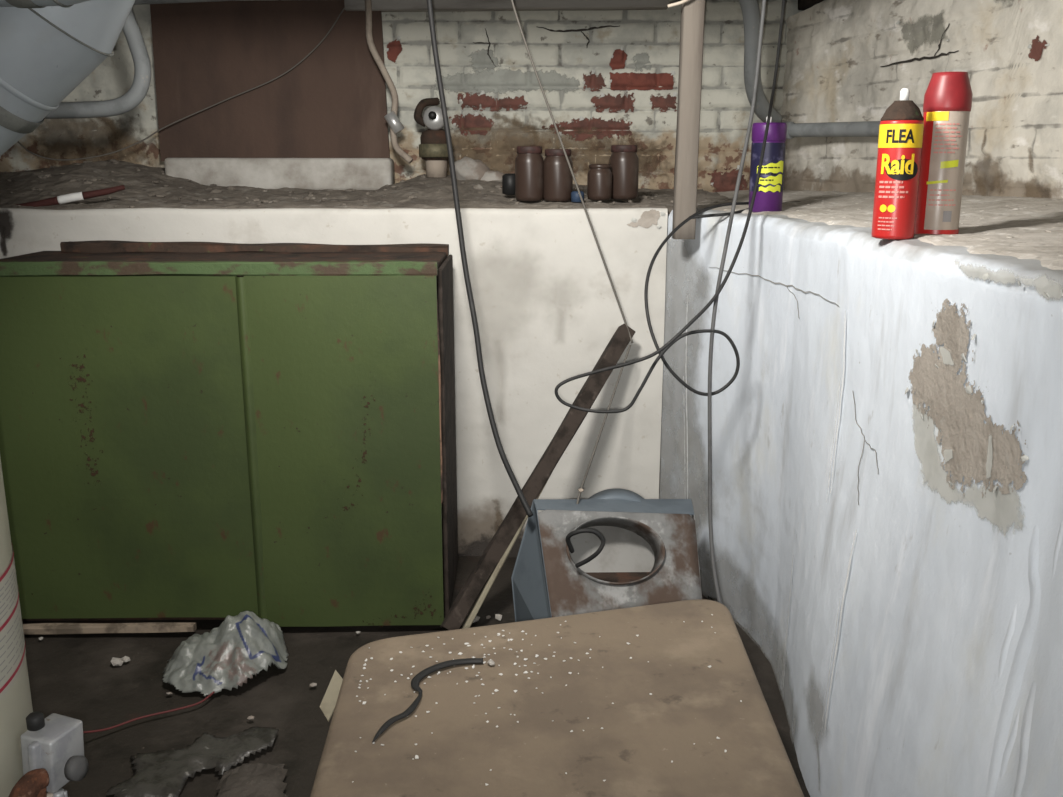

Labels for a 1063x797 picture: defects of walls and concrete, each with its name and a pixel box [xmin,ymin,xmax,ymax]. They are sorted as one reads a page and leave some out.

flaking render [1027,36,1050,61]
flaking render [449,91,528,136]
flaking render [542,46,678,141]
leakage [447,114,665,175]
spalling [955,261,1063,300]
peeling [905,299,1029,535]